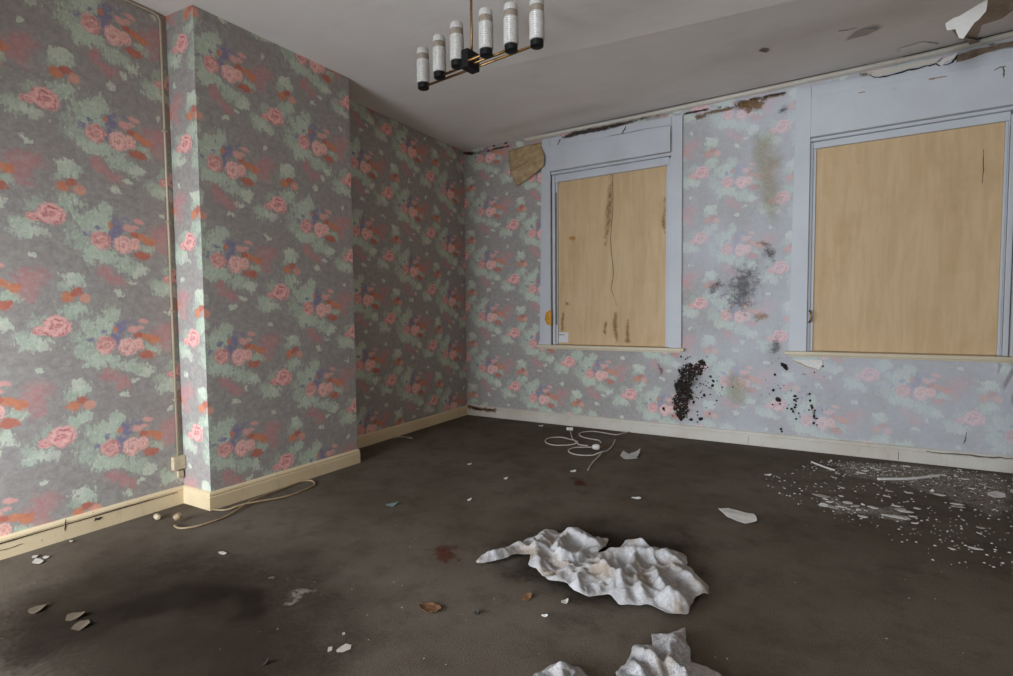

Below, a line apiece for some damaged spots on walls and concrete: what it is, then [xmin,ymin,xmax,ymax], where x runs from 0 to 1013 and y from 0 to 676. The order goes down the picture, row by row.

peeling [945,0,1013,62]
damp [711,270,757,305]
damp [662,355,733,423]